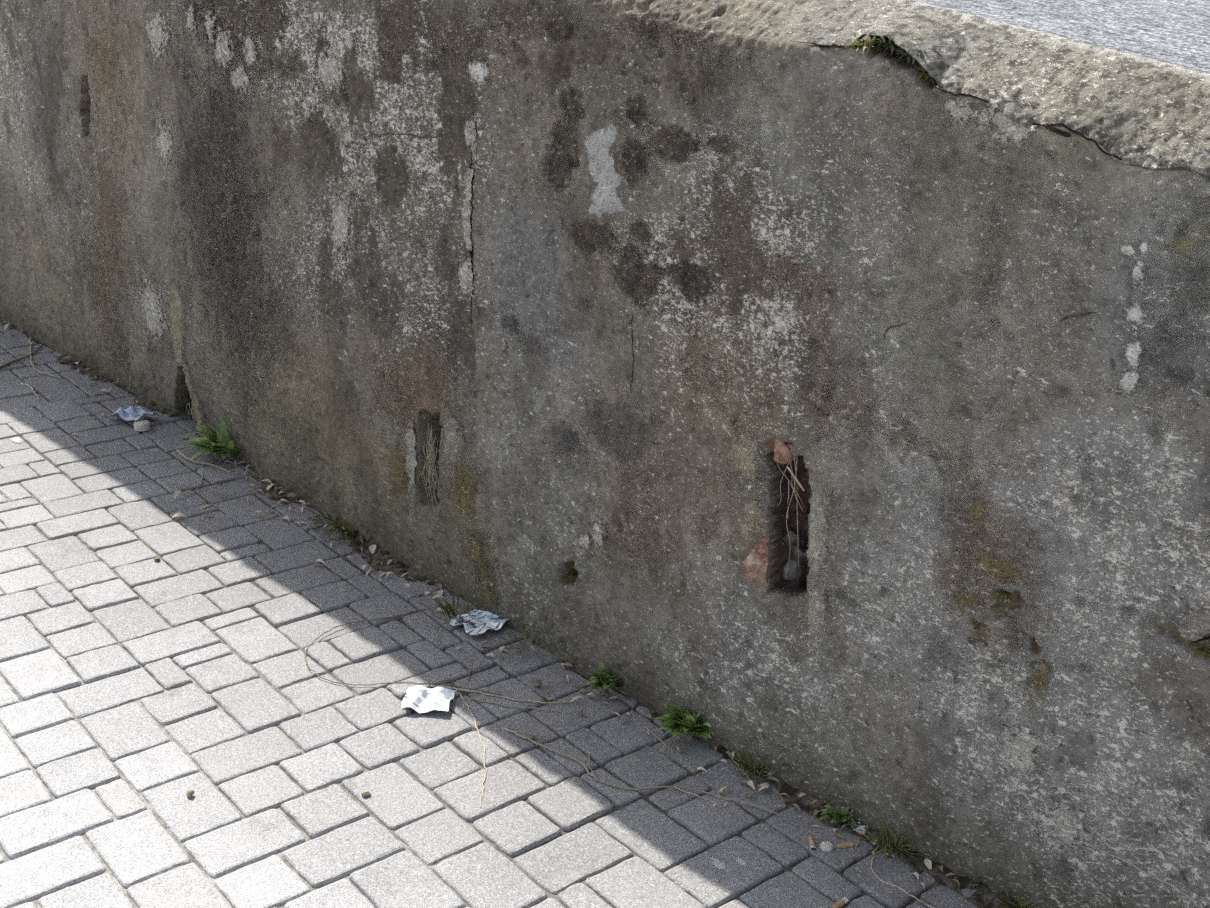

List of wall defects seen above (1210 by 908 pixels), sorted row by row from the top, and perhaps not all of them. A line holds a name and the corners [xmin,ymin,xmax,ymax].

efflorescence [143,10,171,62]
crack [808,43,847,51]
crack [934,87,989,103]
leakage [616,126,740,183]
crack [1032,123,1210,180]
leakage [183,0,347,389]
efflorescence [329,189,352,256]
crack [368,133,474,326]
leakage [567,220,718,309]
efflorescence [135,270,171,346]
peeling [734,435,795,479]
spalling [736,500,769,593]